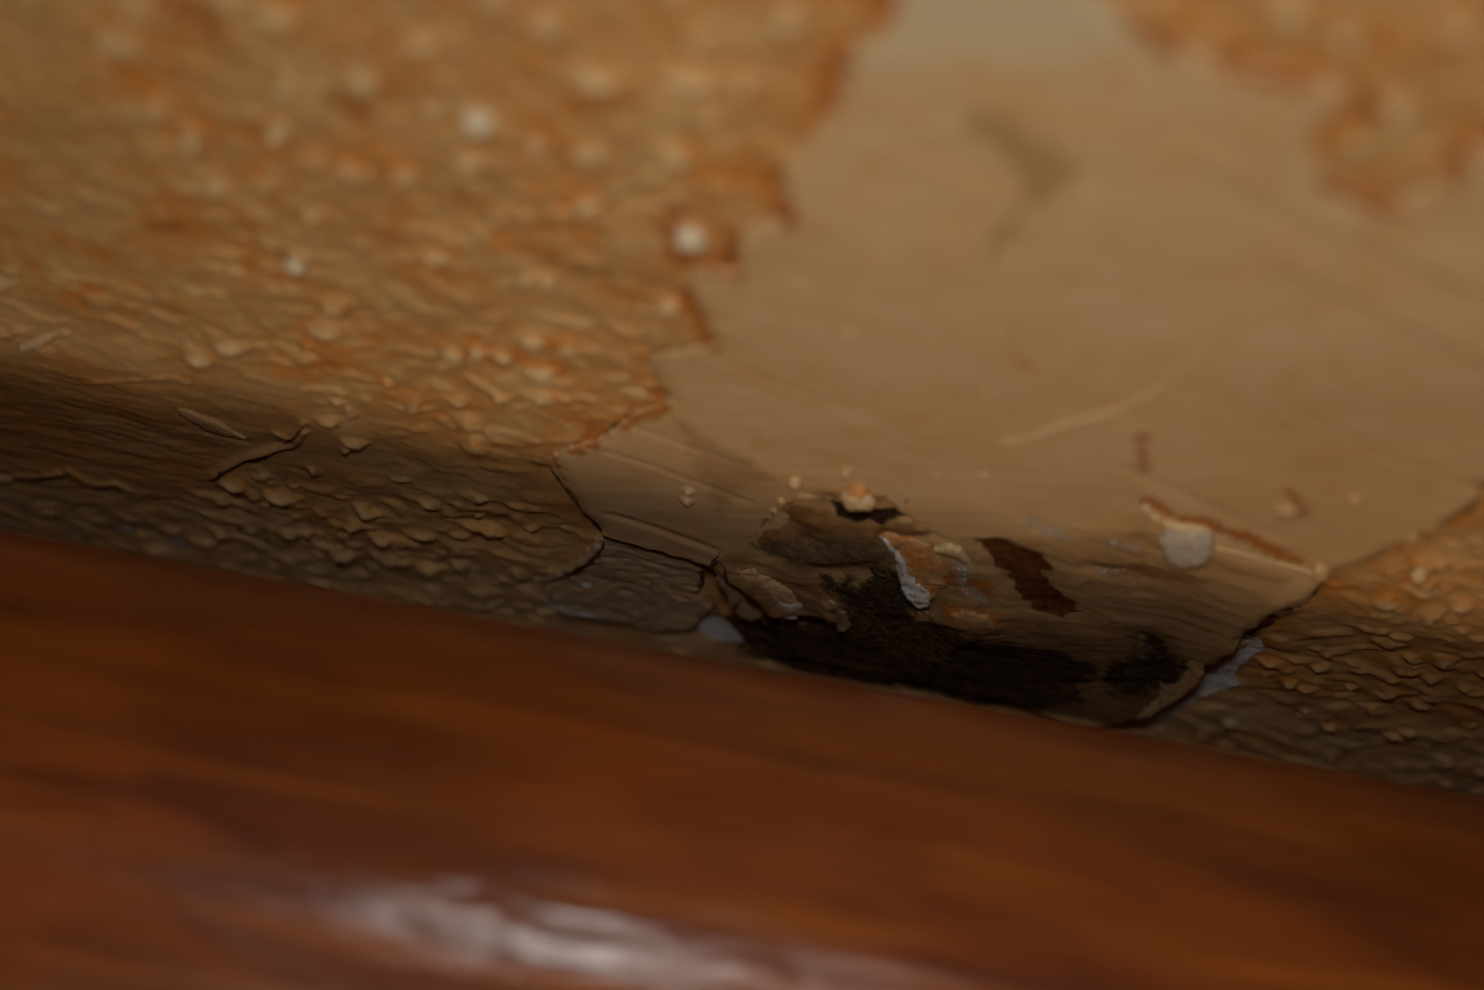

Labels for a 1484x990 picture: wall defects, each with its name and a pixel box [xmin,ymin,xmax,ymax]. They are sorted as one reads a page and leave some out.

leakage [716,505,1216,716]
peeling [543,0,1484,729]